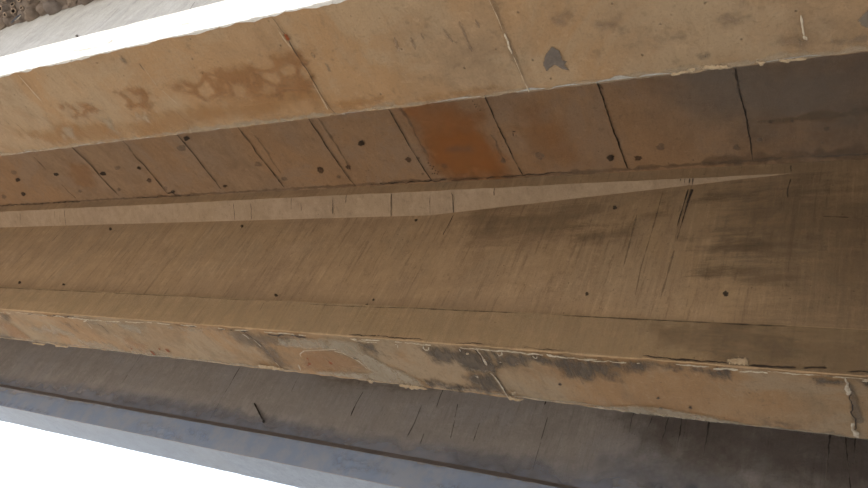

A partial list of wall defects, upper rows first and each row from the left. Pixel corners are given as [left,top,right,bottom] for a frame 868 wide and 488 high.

crack [474,96,523,175]
crack [597,83,628,168]
crack [734,67,753,161]
leakage [280,339,648,407]
leakage [668,365,730,379]
leakage [0,381,638,488]
leakage [592,406,868,488]